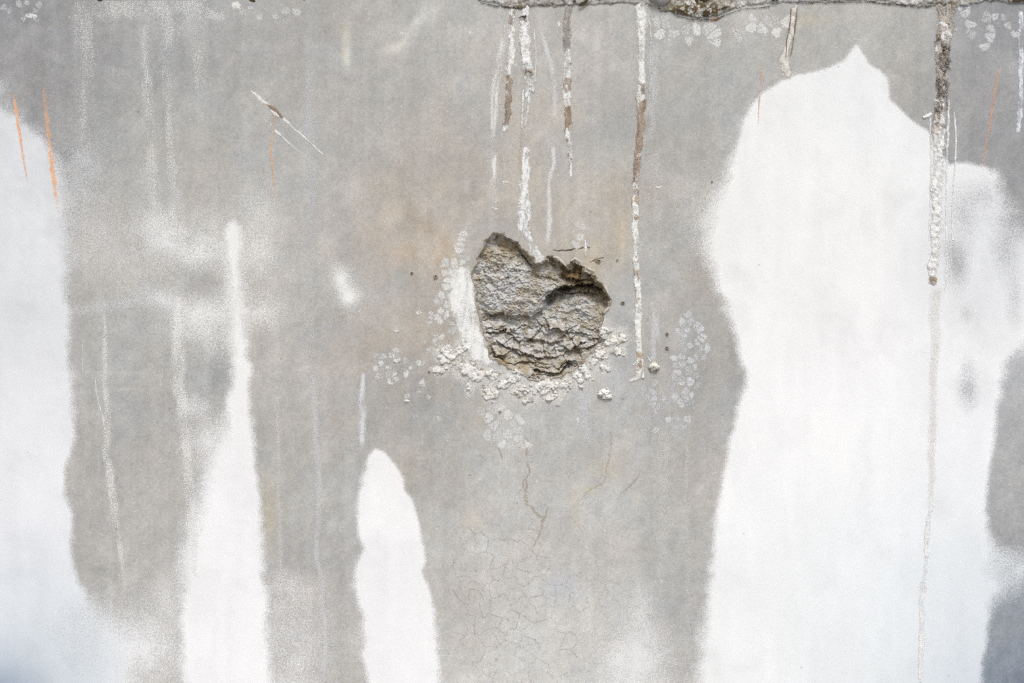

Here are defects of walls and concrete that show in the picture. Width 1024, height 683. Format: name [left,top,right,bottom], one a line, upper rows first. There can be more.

rust [13,94,28,180]
rust [42,89,60,215]
spalling [373,224,625,422]